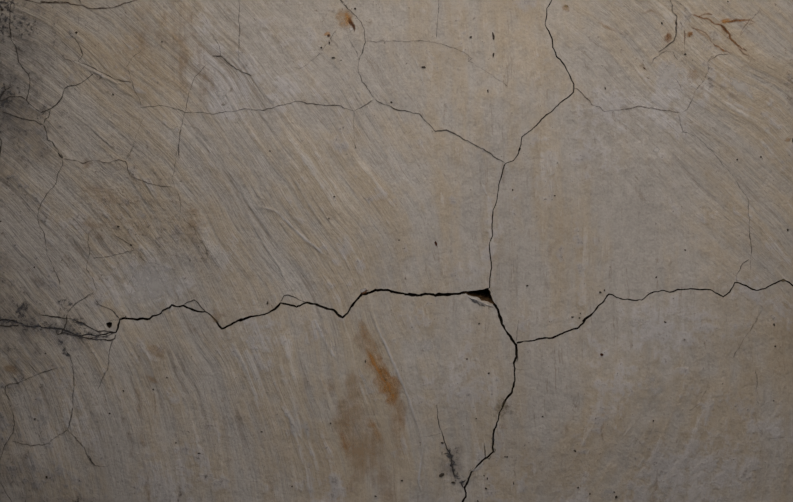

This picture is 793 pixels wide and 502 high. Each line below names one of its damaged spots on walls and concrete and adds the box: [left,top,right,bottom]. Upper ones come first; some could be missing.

corrosion [694,14,746,55]
crack [0,0,692,288]
crack [0,235,466,387]
crack [437,143,793,502]
crack [0,355,105,467]